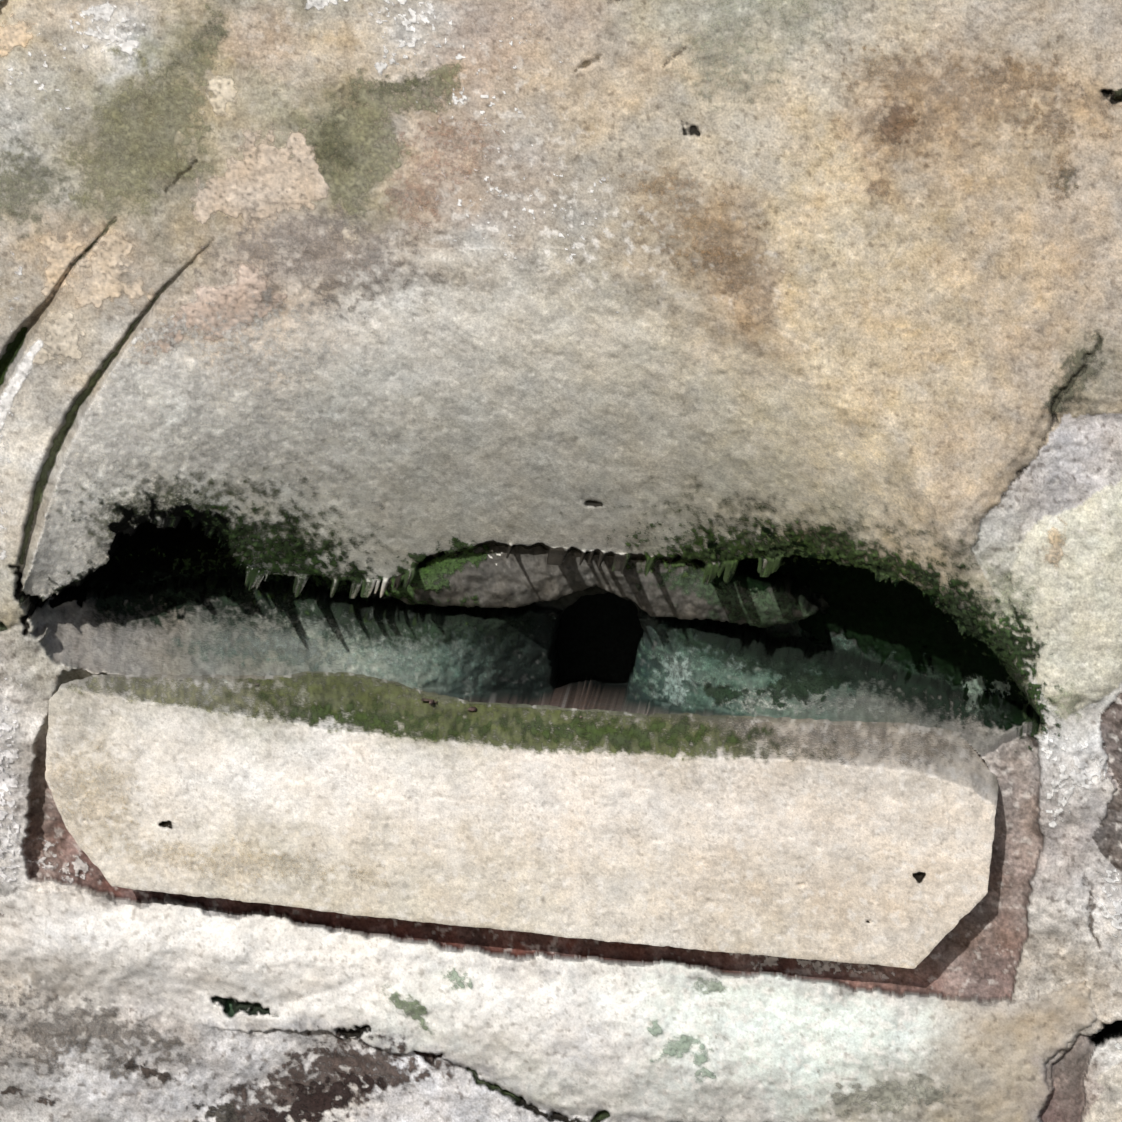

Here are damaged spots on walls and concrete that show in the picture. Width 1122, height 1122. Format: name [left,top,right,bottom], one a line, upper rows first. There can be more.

damp [41,473,533,654]
crack [0,565,55,635]
damp [260,617,1012,766]
crack [337,1025,371,1039]
crack [413,1051,443,1064]
crack [466,1068,610,1122]